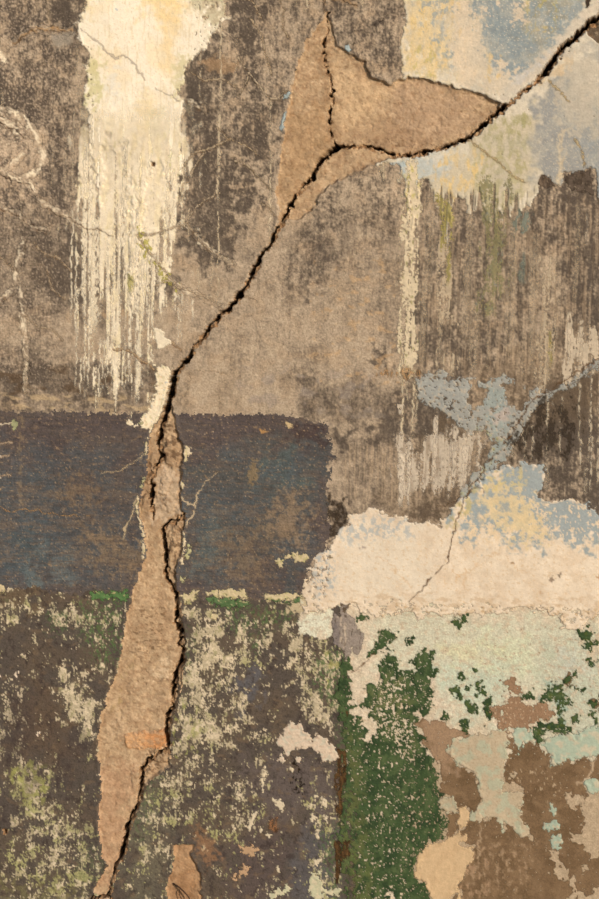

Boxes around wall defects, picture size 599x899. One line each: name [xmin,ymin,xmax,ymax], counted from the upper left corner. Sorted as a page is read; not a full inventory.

crack [61,29,144,78]
peeling [75,0,230,215]
peeling [275,0,599,228]
crack [3,210,109,298]
crack [136,0,599,521]
leakage [395,158,491,505]
crack [447,358,599,563]
leakage [507,255,599,485]
crack [91,493,199,899]
spalling [89,364,250,899]
peeling [260,765,285,813]
peeling [264,359,599,899]